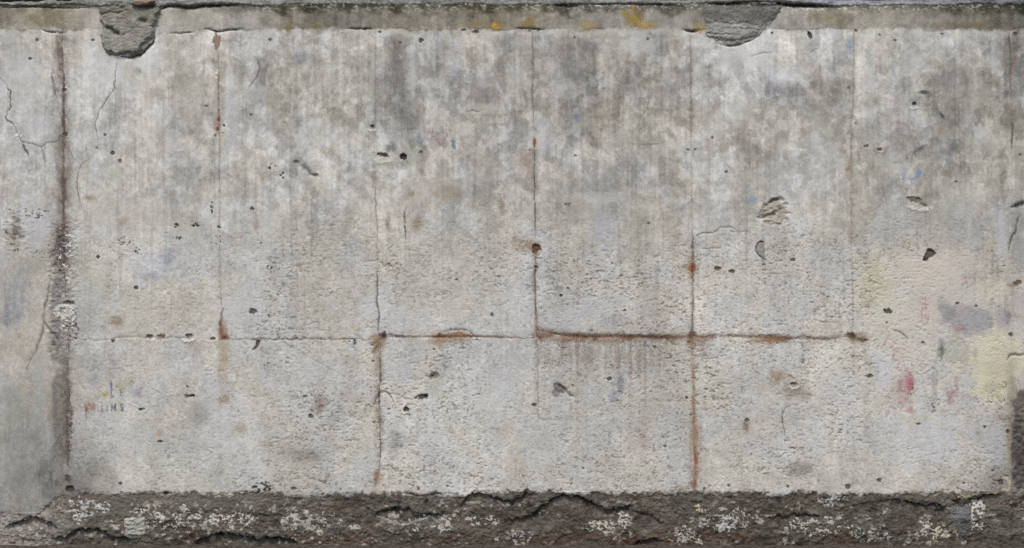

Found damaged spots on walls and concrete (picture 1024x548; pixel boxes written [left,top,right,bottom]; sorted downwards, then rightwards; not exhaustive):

crack [5,6,81,240]
spalling [761,199,787,224]
rust [686,387,699,487]